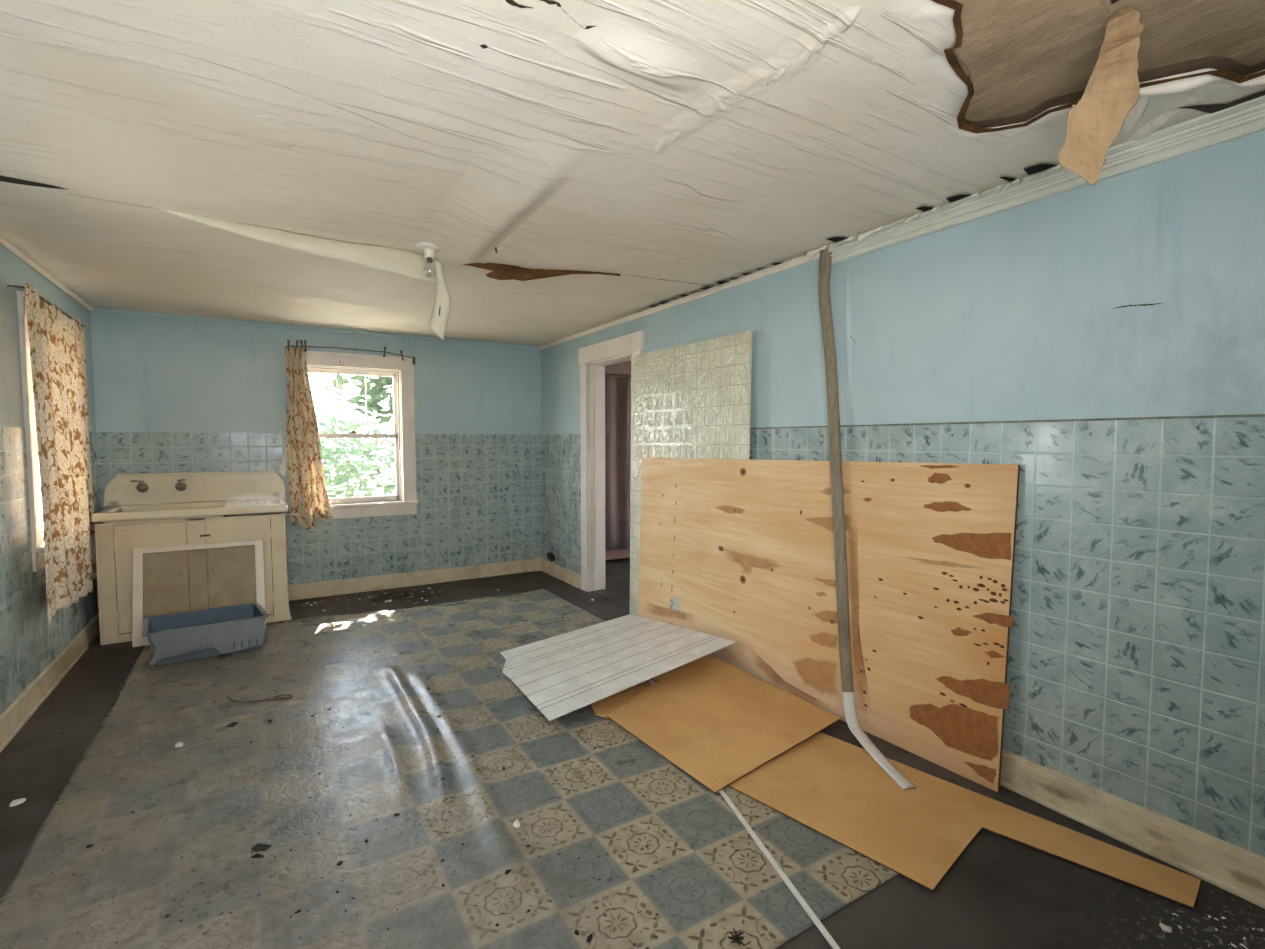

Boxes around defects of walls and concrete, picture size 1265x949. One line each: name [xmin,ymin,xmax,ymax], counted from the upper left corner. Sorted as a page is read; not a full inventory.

crack [506,0,595,29]
peeling [639,0,1265,314]
peeling [0,175,451,340]
peeling [463,247,620,281]